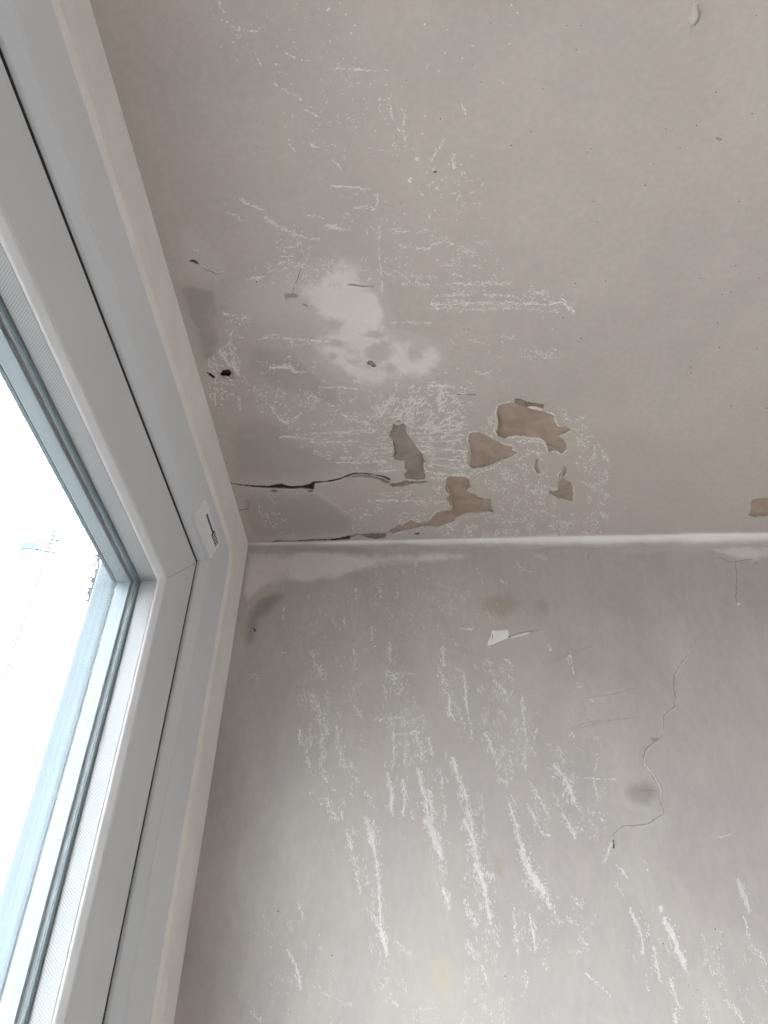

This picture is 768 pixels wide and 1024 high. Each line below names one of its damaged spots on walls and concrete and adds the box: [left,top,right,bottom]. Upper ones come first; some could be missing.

crack [231,473,426,542]
leakage [173,197,576,653]
peeling [388,398,575,535]
peeling [749,498,768,517]
spalling [488,630,542,646]
crack [613,645,693,849]